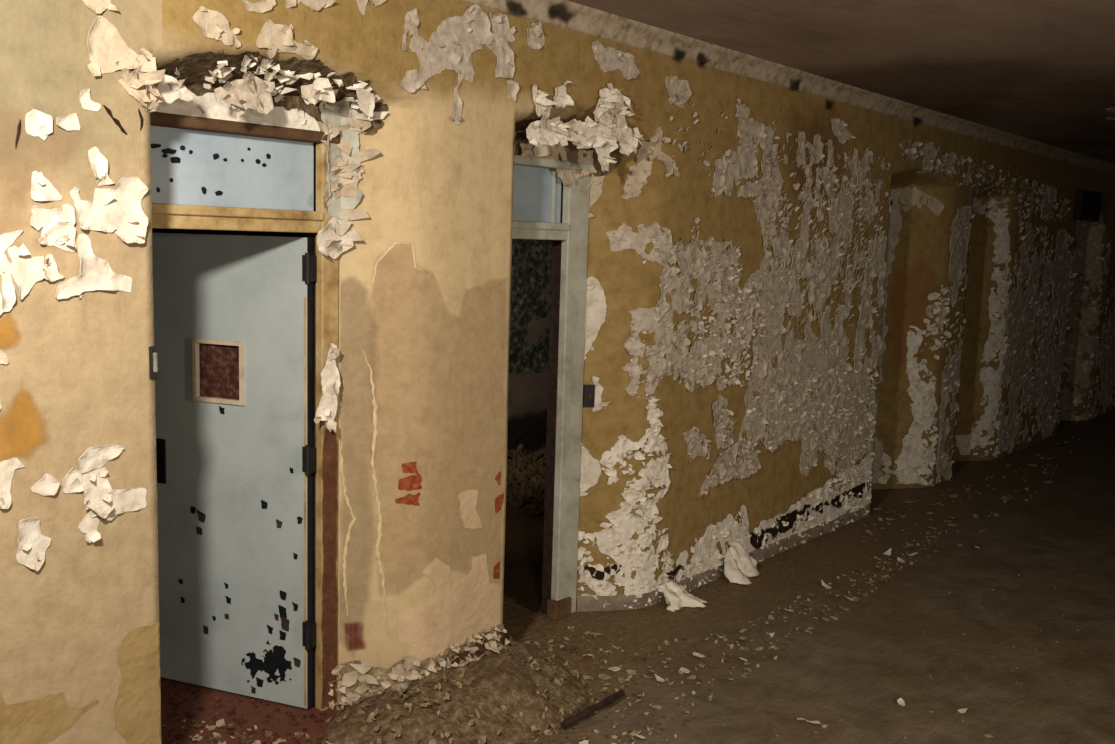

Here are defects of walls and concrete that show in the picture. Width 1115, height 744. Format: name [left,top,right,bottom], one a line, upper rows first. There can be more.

peeling [25,0,389,259]
peeling [0,147,173,315]
peeling [401,4,1115,609]
peeling [0,458,25,509]
peeling [16,517,51,571]
peeling [31,444,147,543]
spalling [395,461,422,506]
peeling [0,692,99,744]
peeling [114,622,161,744]
peeling [328,554,511,710]